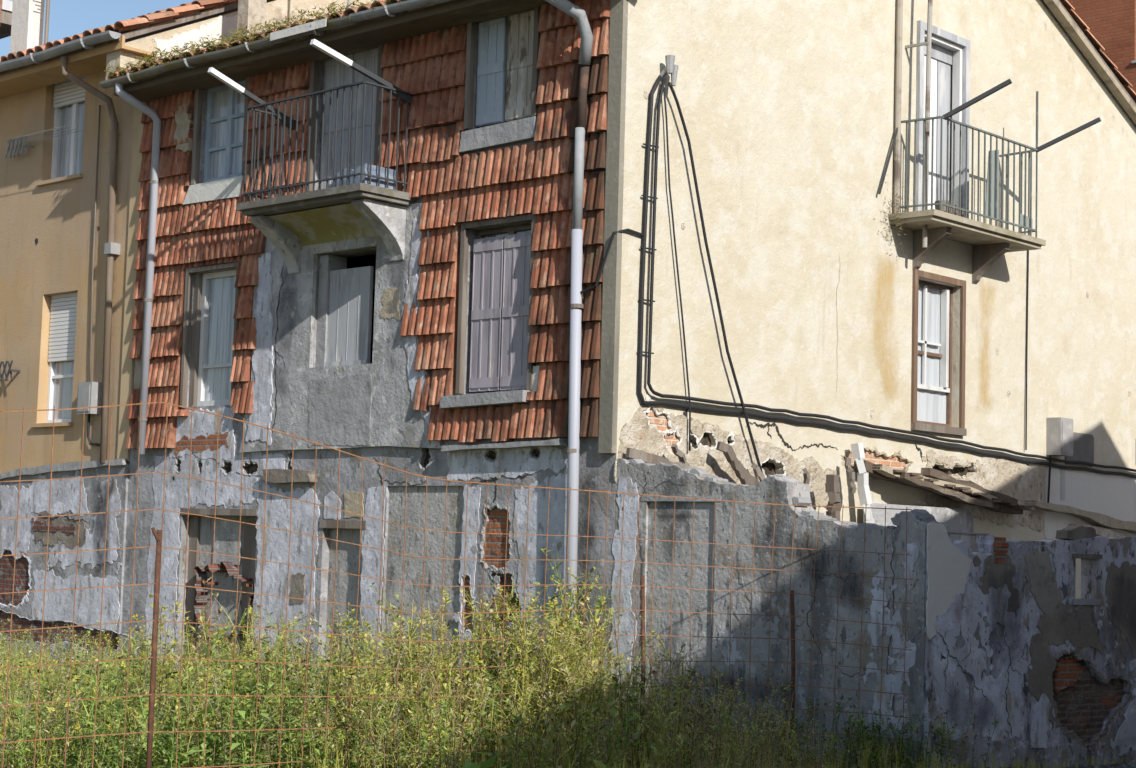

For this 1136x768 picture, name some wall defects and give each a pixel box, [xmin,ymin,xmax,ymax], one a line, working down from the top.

peeling [0,406,341,681]
peeling [417,438,578,690]
flaking render [642,394,737,455]
spalling [761,457,787,478]
crack [746,422,838,451]
peeling [861,543,919,746]
flaking render [973,537,1010,567]
peeling [932,583,1136,756]